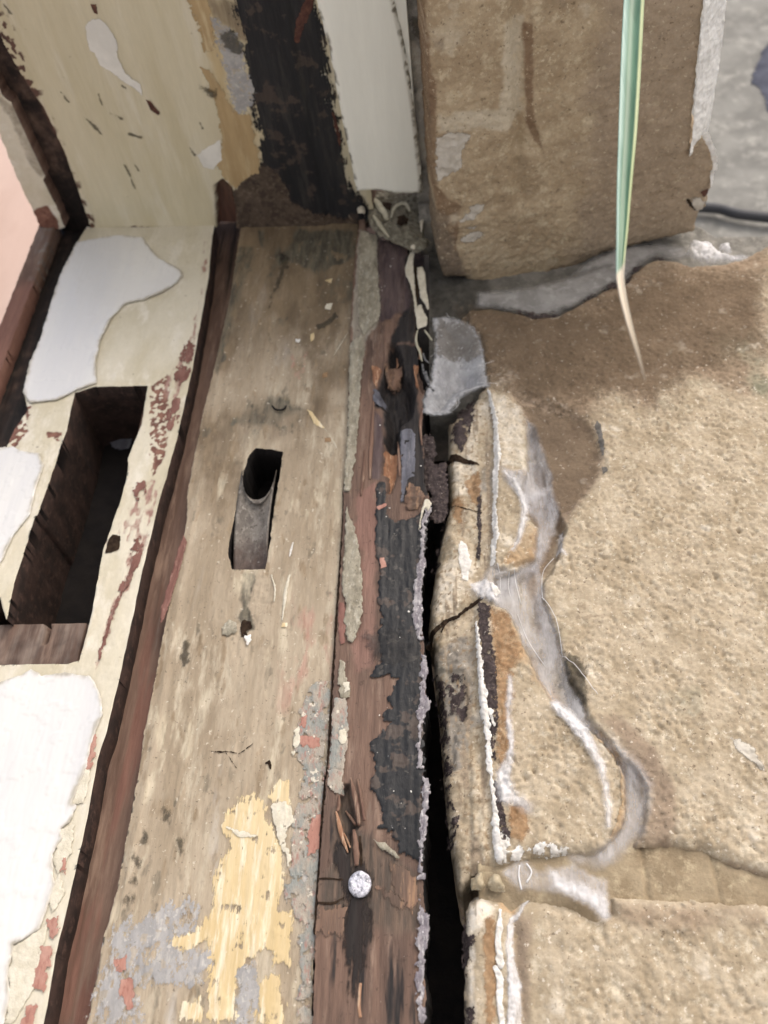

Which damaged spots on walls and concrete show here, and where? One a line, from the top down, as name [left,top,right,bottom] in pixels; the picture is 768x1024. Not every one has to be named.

water stain [187,0,370,228]
spalling [689,0,727,187]
peeling [23,235,182,403]
water stain [583,266,642,302]
peeling [0,669,103,1024]
peeling [86,660,350,1024]
peeling [338,507,363,644]
peeling [370,481,466,1024]
crack [426,597,483,651]
water stain [450,388,502,581]
water stain [432,602,569,865]
water stain [559,651,587,717]